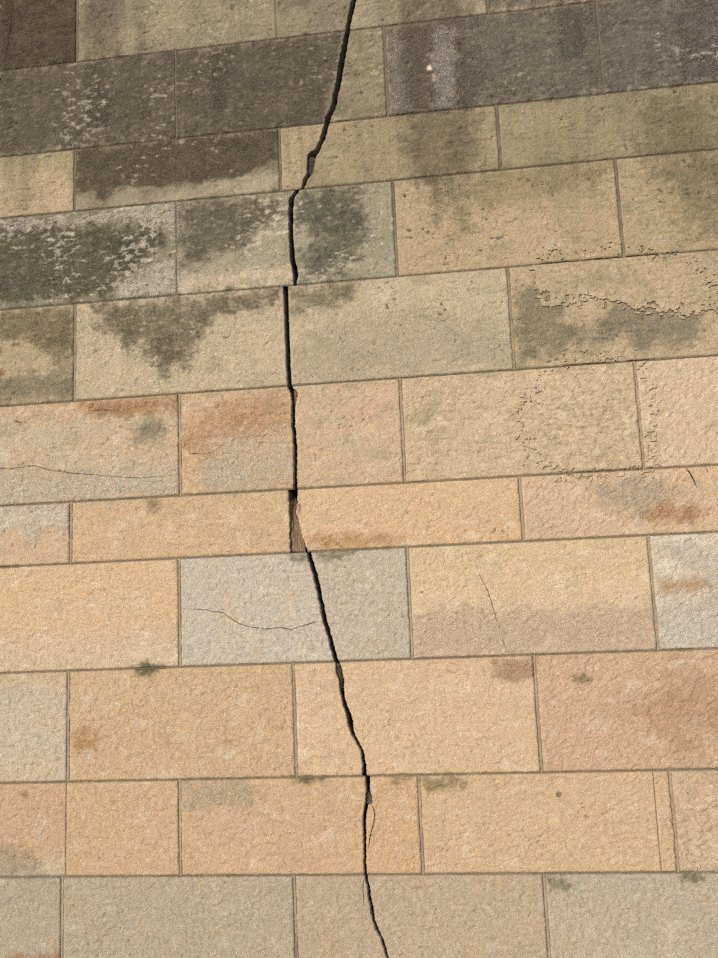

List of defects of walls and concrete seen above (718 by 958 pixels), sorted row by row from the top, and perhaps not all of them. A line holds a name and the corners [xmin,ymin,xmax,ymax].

leakage [118,261,178,297]
leakage [0,0,336,200]
crack [284,0,357,504]
crack [198,539,389,958]